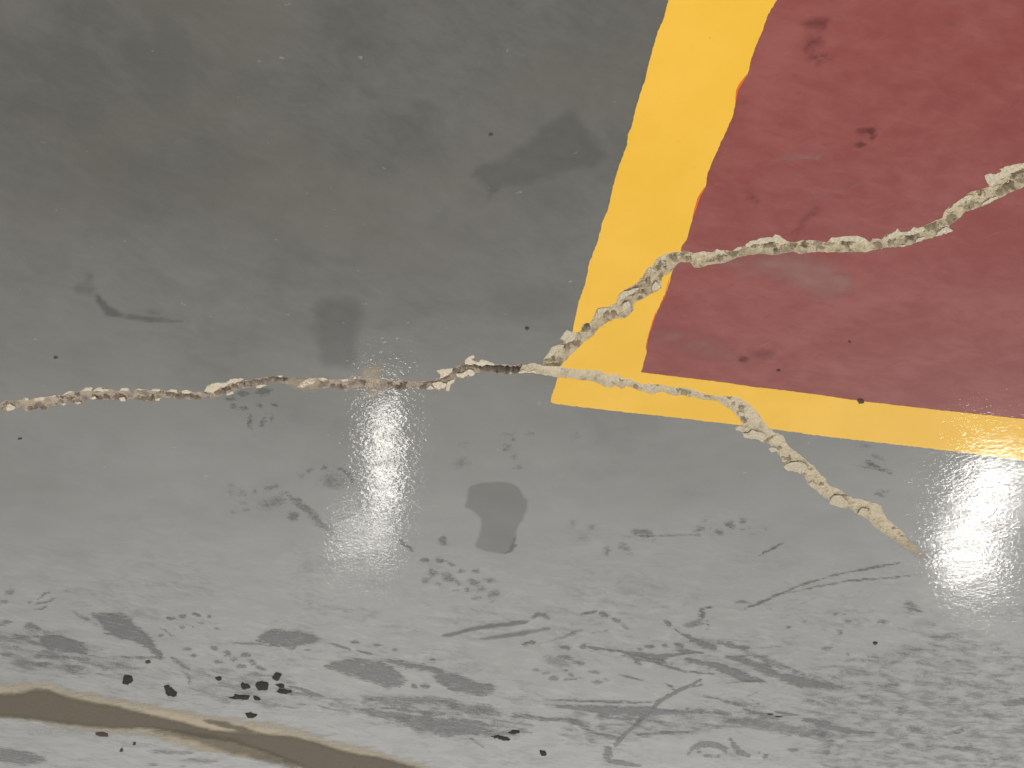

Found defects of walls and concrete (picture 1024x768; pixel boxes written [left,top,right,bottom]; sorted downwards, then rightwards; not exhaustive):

crack [0,163,1024,553]
water stain [0,684,432,768]